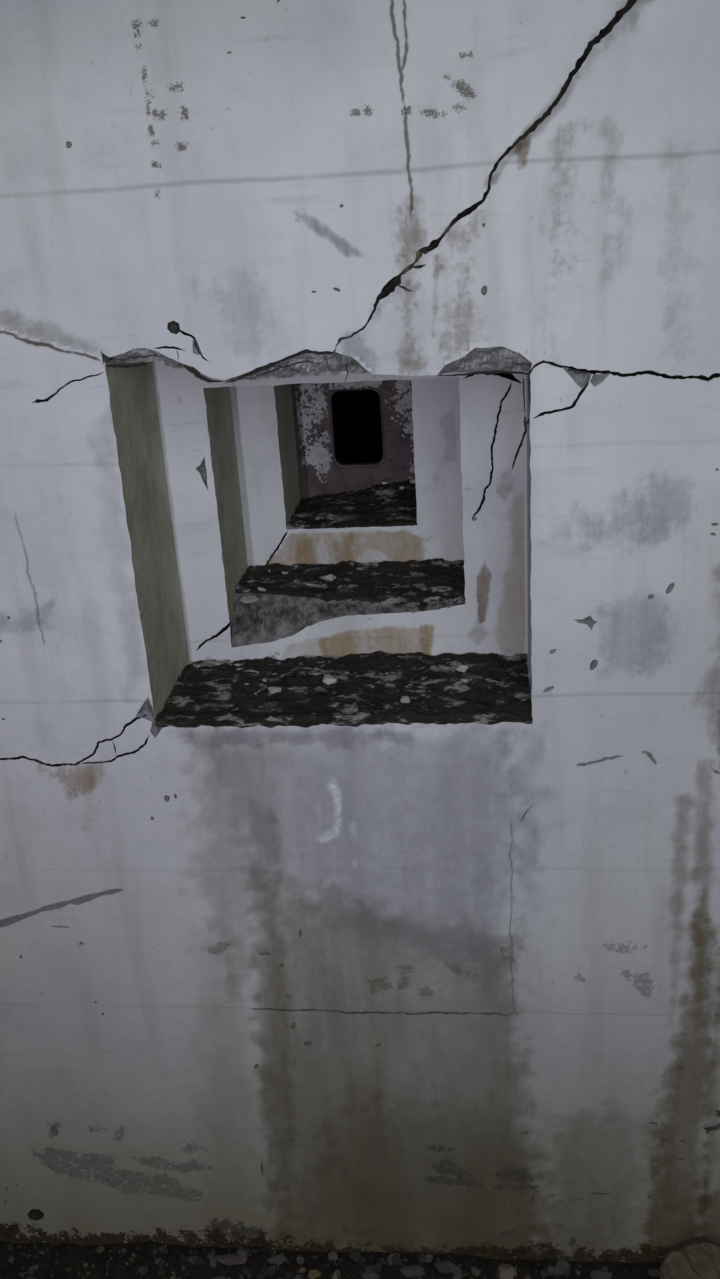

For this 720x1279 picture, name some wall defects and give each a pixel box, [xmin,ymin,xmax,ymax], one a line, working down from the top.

crack [0,0,637,403]
spalling [195,457,208,490]
peeling [102,338,415,484]
spalling [437,346,532,430]
crack [439,360,720,517]
spalling [230,593,465,647]
crack [0,715,149,767]
efflorescence [317,779,342,843]